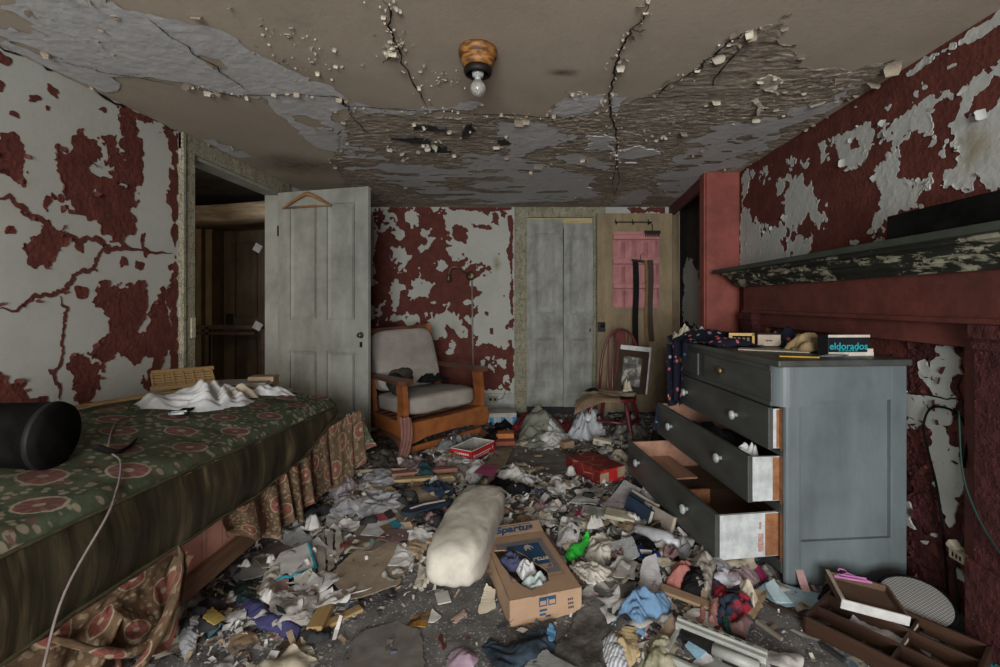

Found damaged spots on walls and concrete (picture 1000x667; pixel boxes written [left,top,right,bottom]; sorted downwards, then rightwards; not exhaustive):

crack [0,0,754,196]
peeling [0,0,1000,405]
peeling [907,344,964,530]